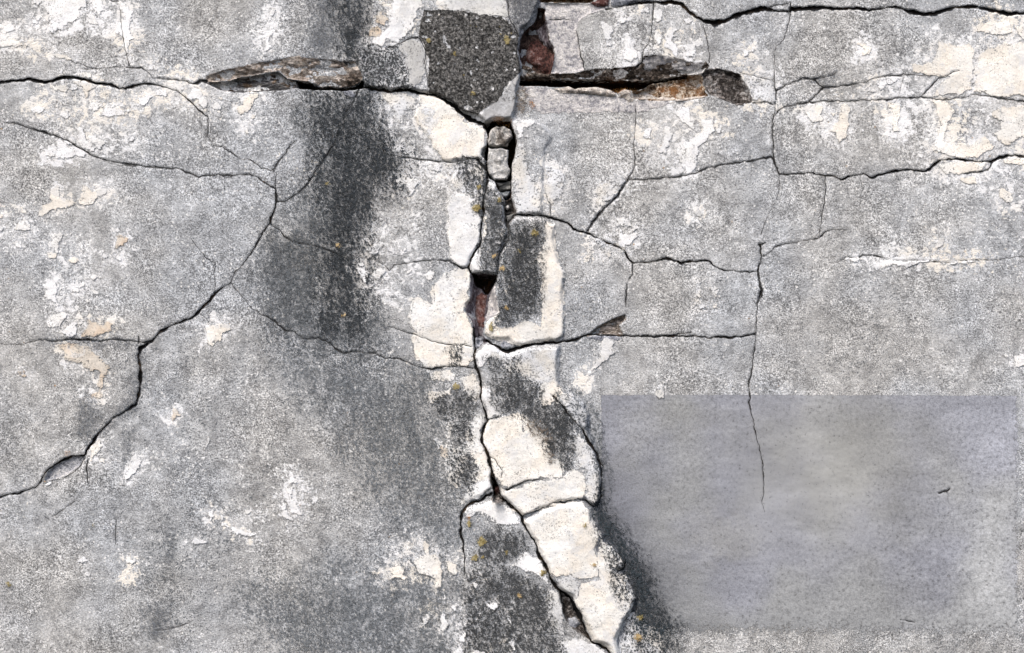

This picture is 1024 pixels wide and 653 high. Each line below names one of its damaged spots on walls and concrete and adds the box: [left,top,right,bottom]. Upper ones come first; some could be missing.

spalling [50,30,364,134]
water stain [302,0,380,67]
spalling [369,0,776,176]
peeling [389,175,419,196]
spalling [504,199,516,222]
crack [486,0,1024,512]
crack [0,0,611,653]
water stain [227,79,689,653]
spalling [466,273,511,348]